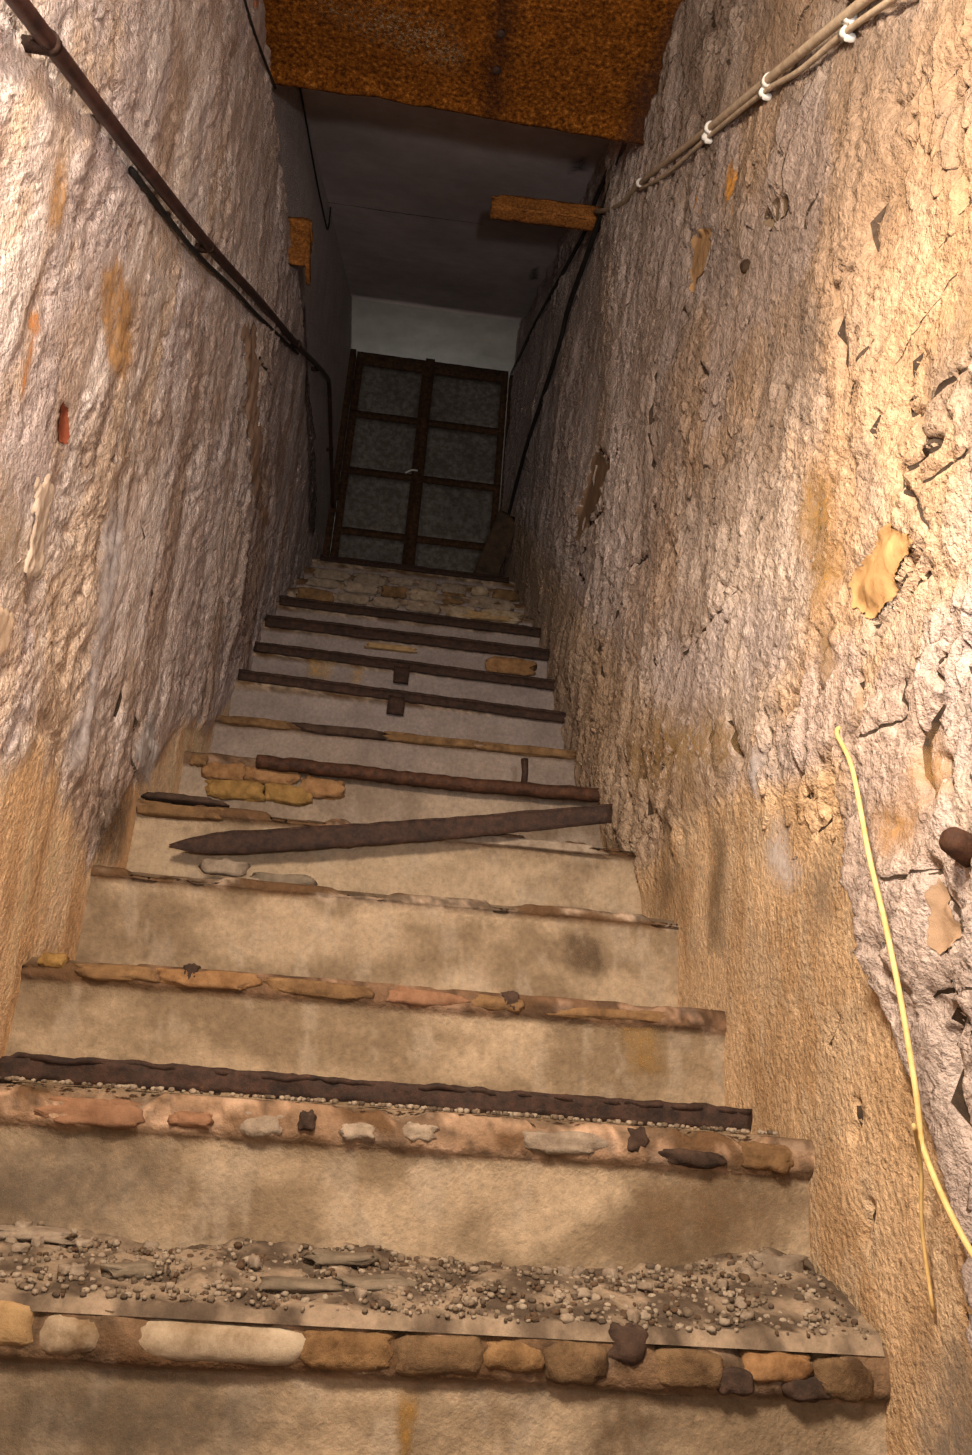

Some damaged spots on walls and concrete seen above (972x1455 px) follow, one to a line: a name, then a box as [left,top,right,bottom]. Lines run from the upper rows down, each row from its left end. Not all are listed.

spalling [849,523,913,619]